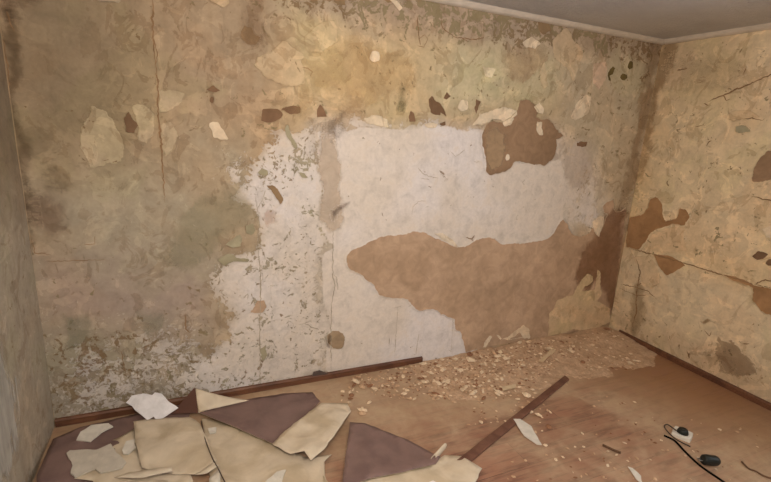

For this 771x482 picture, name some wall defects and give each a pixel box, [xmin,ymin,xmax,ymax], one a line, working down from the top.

crack [150,0,165,201]
crack [704,69,771,106]
peeling [209,122,228,140]
spalling [260,104,302,149]
flaking render [408,92,564,177]
flaking render [751,150,771,183]
spalling [257,168,284,205]
flaking render [344,196,692,353]
spalling [751,250,771,266]
flaking render [722,273,771,316]
spalling [326,330,346,349]
flaking render [126,392,178,420]